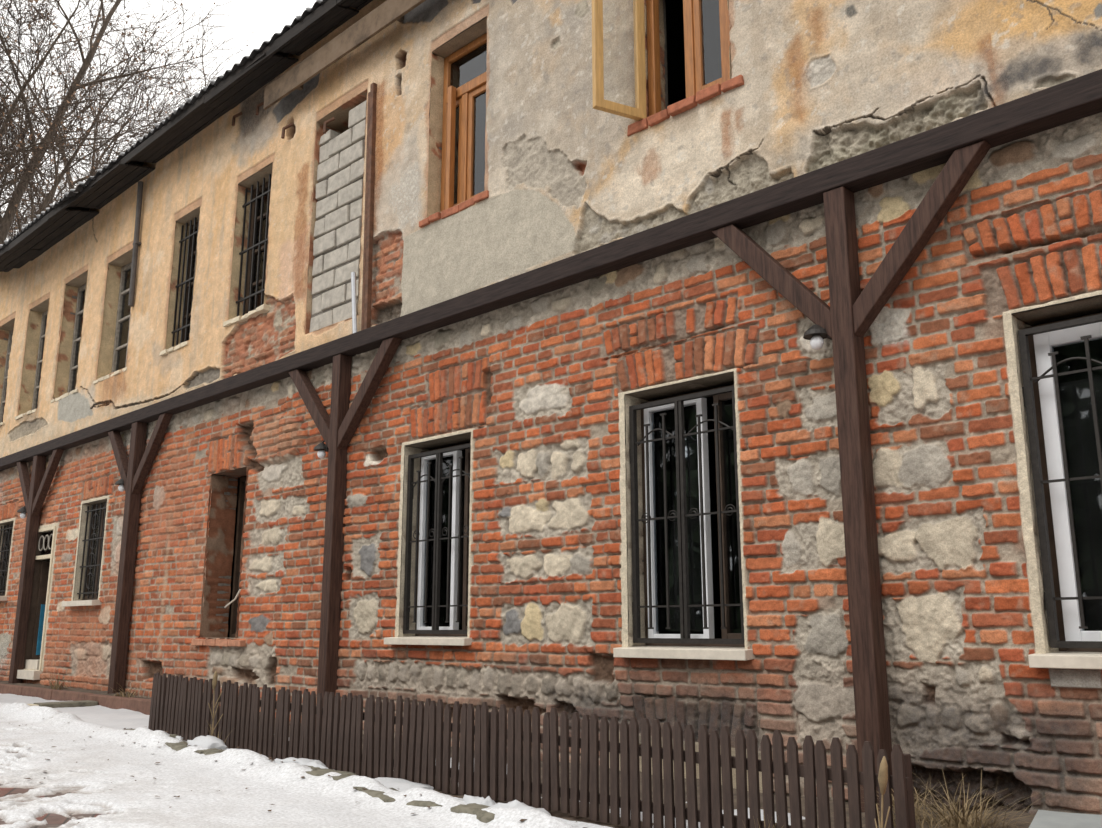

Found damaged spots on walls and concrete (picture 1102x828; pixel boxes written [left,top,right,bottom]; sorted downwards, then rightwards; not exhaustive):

crack [1027,0,1102,30]
spalling [801,50,840,92]
spalling [1029,69,1081,93]
spalling [497,75,997,256]
spalling [371,226,404,327]
spalling [182,290,298,392]
crack [80,374,199,409]
spalling [7,416,49,443]